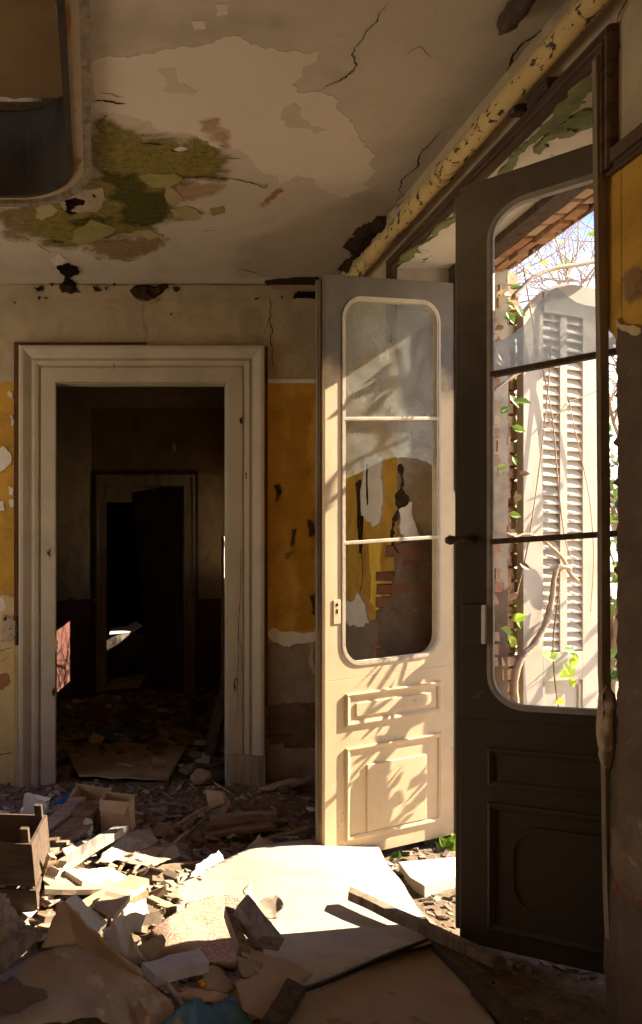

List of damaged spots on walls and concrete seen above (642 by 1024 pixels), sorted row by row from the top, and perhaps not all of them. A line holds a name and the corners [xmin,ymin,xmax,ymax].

crack [314,3,388,91]
peeling [90,35,376,198]
flaking render [35,253,81,300]
flaking render [19,157,117,246]
damp [0,118,228,261]
flaking render [129,284,180,305]
peeling [139,172,225,221]
crack [154,269,276,373]
flaking render [337,196,404,275]
crack [398,127,448,199]
peeling [0,446,12,472]
peeling [267,628,315,778]